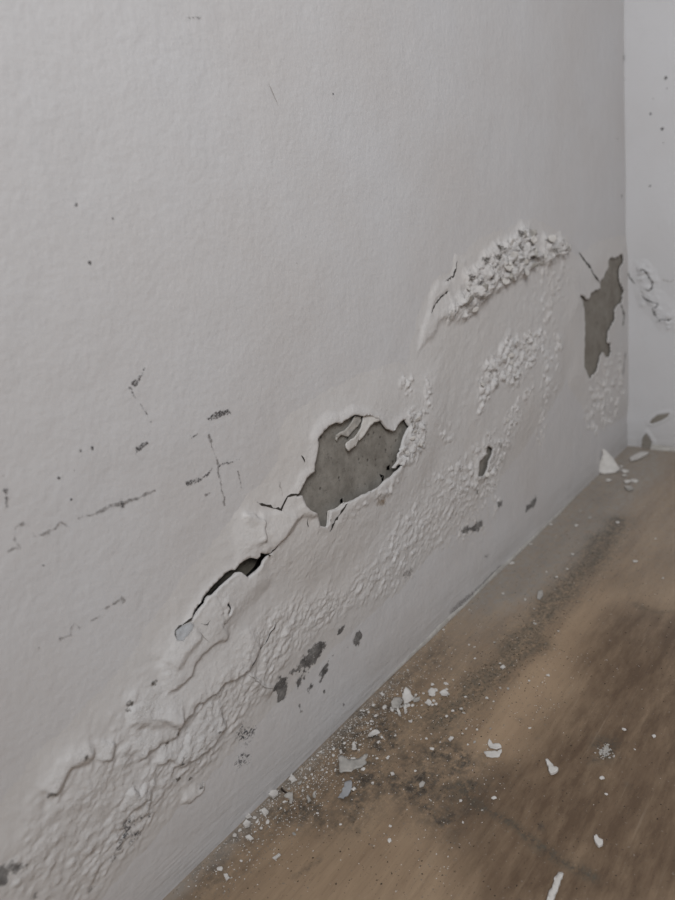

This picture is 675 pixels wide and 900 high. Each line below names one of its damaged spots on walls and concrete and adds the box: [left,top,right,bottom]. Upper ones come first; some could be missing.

peeling [565,235,629,438]
crack [186,435,239,504]
crack [175,617,229,641]
peeling [64,352,463,900]